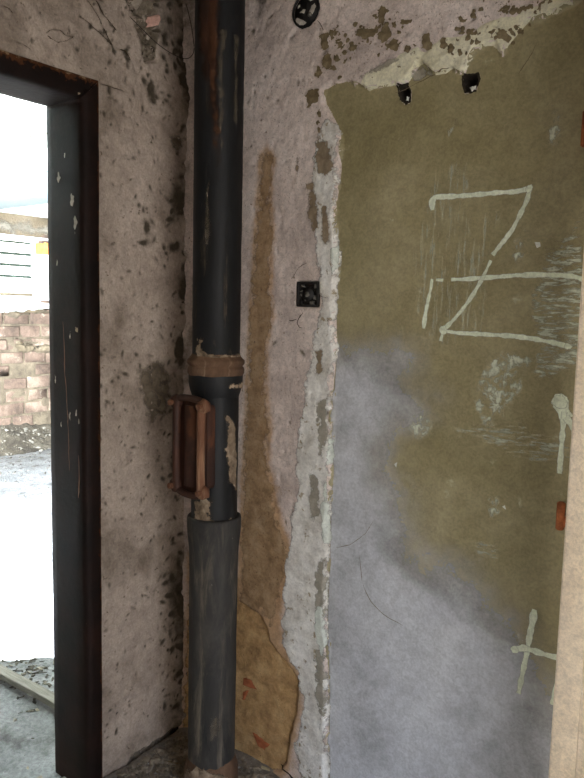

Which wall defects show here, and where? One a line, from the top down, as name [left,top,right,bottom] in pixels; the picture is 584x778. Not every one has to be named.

crack [85,1,130,58]
spalling [127,0,163,62]
peeling [194,0,584,778]
spalling [131,620,189,762]